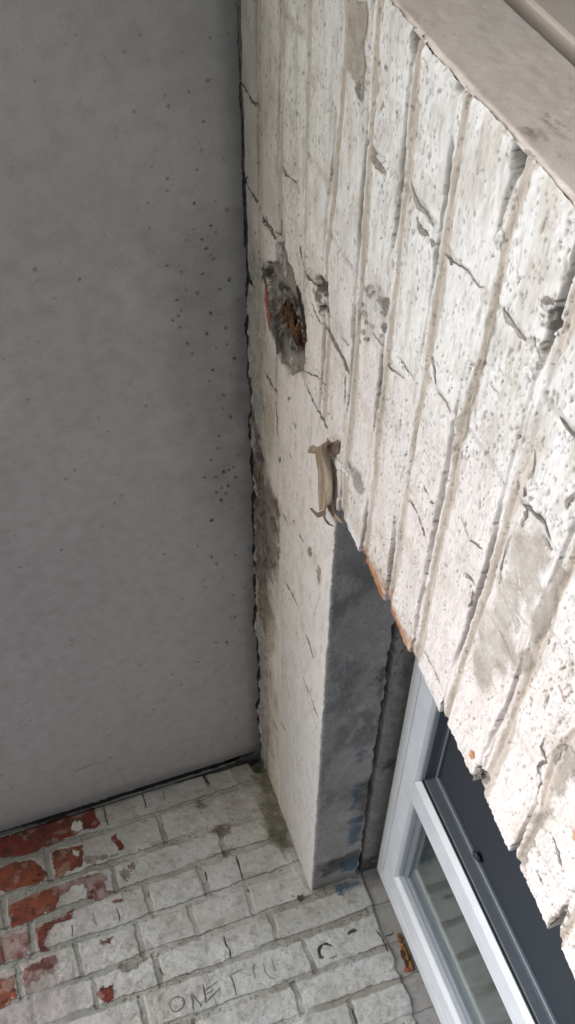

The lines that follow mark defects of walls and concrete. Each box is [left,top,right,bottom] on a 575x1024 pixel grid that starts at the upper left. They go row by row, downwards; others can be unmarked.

spalling [261,242,330,375]
damp [250,398,280,629]
peeling [0,808,124,1009]
peeling [119,957,146,972]